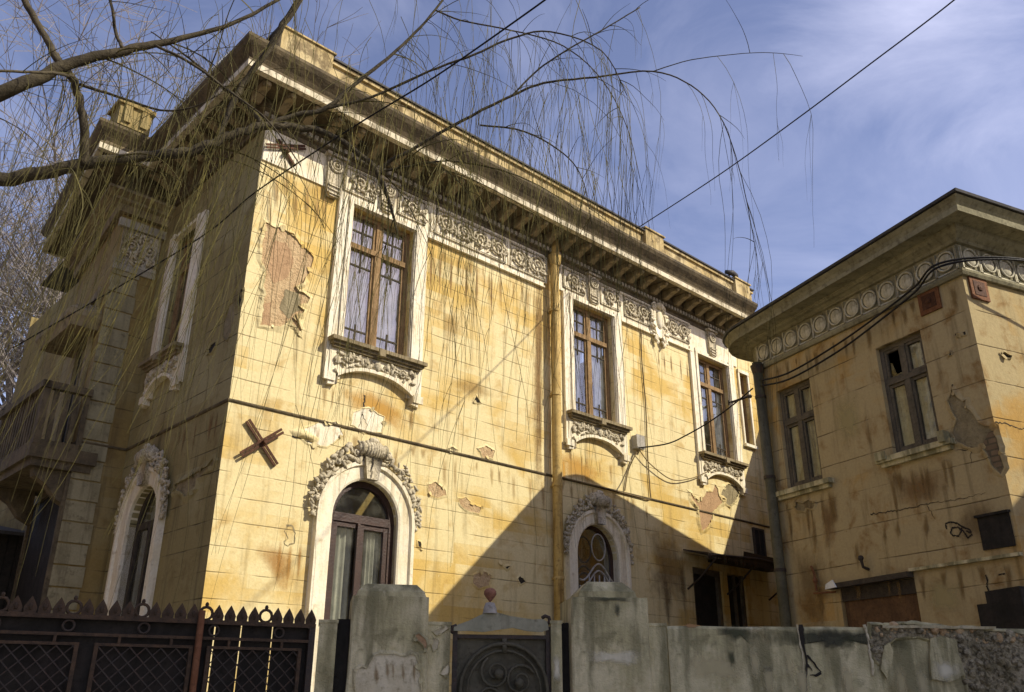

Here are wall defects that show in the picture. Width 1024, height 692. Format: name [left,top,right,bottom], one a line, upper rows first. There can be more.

flaking render [256,218,317,340]
peeling [300,407,387,449]
flaking render [945,385,1009,478]
flaking render [426,480,484,515]
flaking render [686,481,741,535]
crack [870,493,983,516]
spalling [867,620,1024,692]